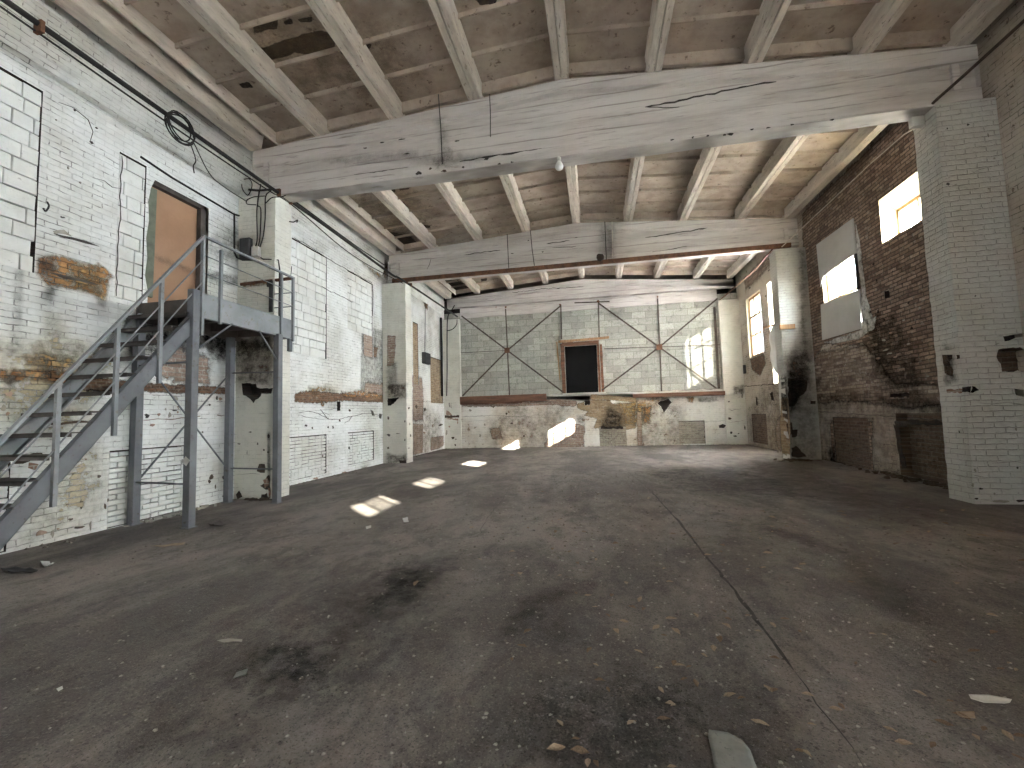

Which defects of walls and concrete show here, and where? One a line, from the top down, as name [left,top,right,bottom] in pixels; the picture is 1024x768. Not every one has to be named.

crack [646,81,776,108]
peeling [802,122,978,409]
spalling [997,334,1024,372]
spalling [242,383,273,403]
peeling [361,329,472,455]
flaking render [544,394,644,447]
crack [628,472,864,767]